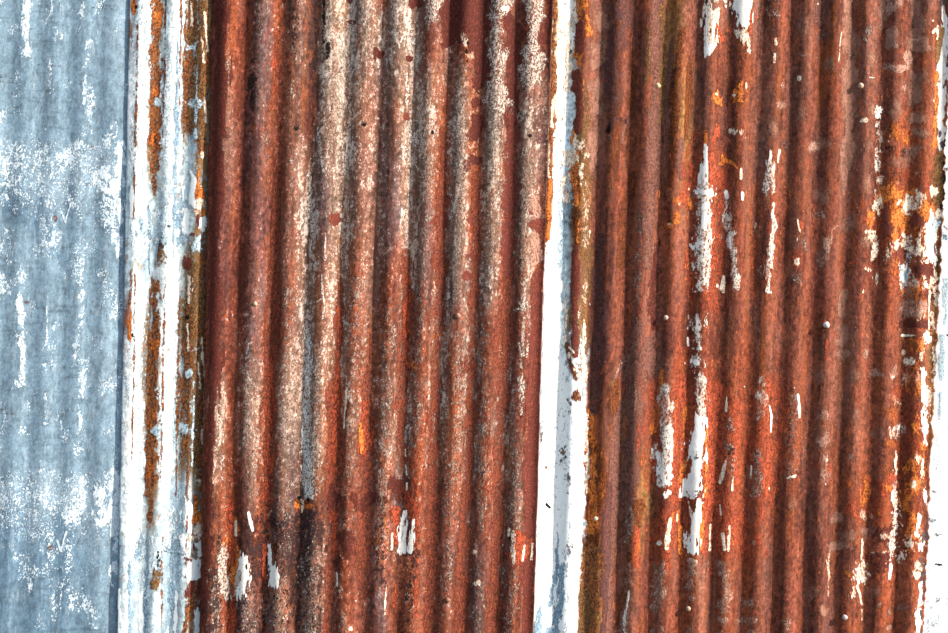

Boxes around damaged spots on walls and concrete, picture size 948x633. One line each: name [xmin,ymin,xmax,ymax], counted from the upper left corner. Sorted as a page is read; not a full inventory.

corrosion [570,0,594,135]
corrosion [600,0,638,268]
corrosion [661,26,734,313]
corrosion [711,80,748,113]
peeling [691,0,781,63]
corrosion [885,119,913,158]
corrosion [565,176,790,633]
peeling [609,123,838,633]
corrosion [842,132,948,599]
peeling [844,380,948,633]
peeling [846,247,948,419]